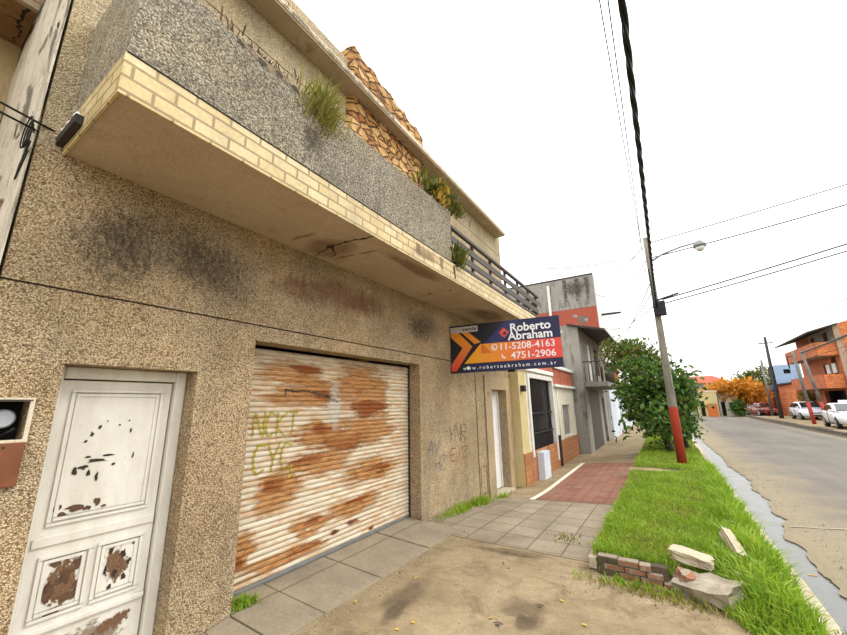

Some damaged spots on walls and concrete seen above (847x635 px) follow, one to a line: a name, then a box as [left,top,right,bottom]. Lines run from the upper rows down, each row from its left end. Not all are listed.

crack [3,8,32,42]
crack [314,236,373,256]
corrosion [252,359,397,518]
peeling [72,454,115,481]
peeling [53,498,106,517]
corrosion [233,491,380,586]
peeling [103,541,135,590]
peeling [41,555,82,617]
peeling [65,608,130,635]